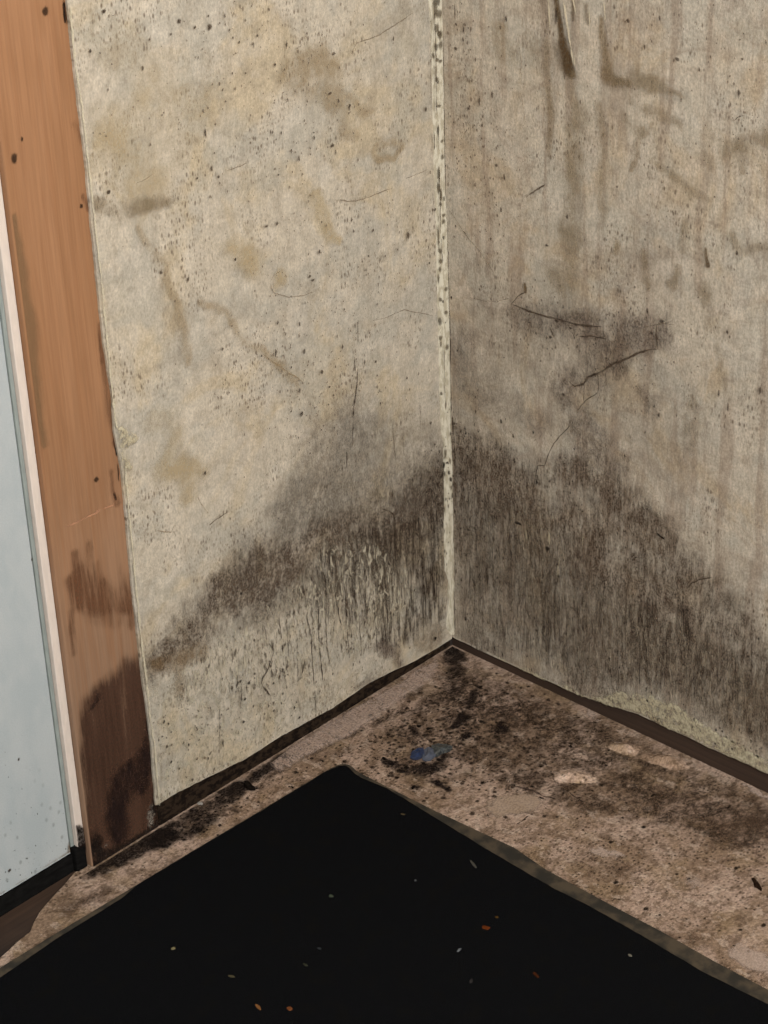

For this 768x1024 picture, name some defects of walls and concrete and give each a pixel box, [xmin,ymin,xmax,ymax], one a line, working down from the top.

leakage [547,0,576,78]
leakage [589,0,657,98]
leakage [235,0,520,457]
crack [473,292,605,339]
leakage [516,277,667,377]
crack [571,322,668,404]
leakage [52,390,768,894]